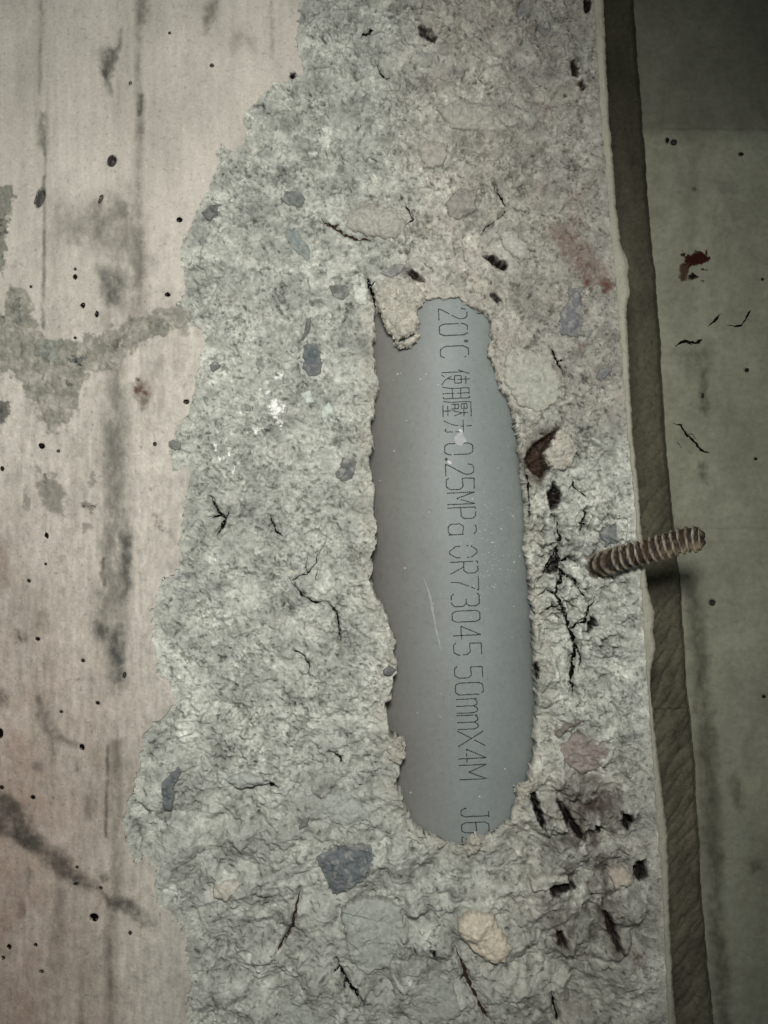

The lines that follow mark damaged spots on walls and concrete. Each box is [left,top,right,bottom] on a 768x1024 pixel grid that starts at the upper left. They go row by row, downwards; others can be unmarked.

rust [679,250,710,282]
crack [675,310,751,347]
crack [673,423,710,453]
crack [209,498,229,534]
spalling [123,0,668,1024]
crack [291,542,341,640]
crack [524,467,595,694]
damp [98,625,122,664]
damp [0,795,83,883]
crack [276,886,300,953]